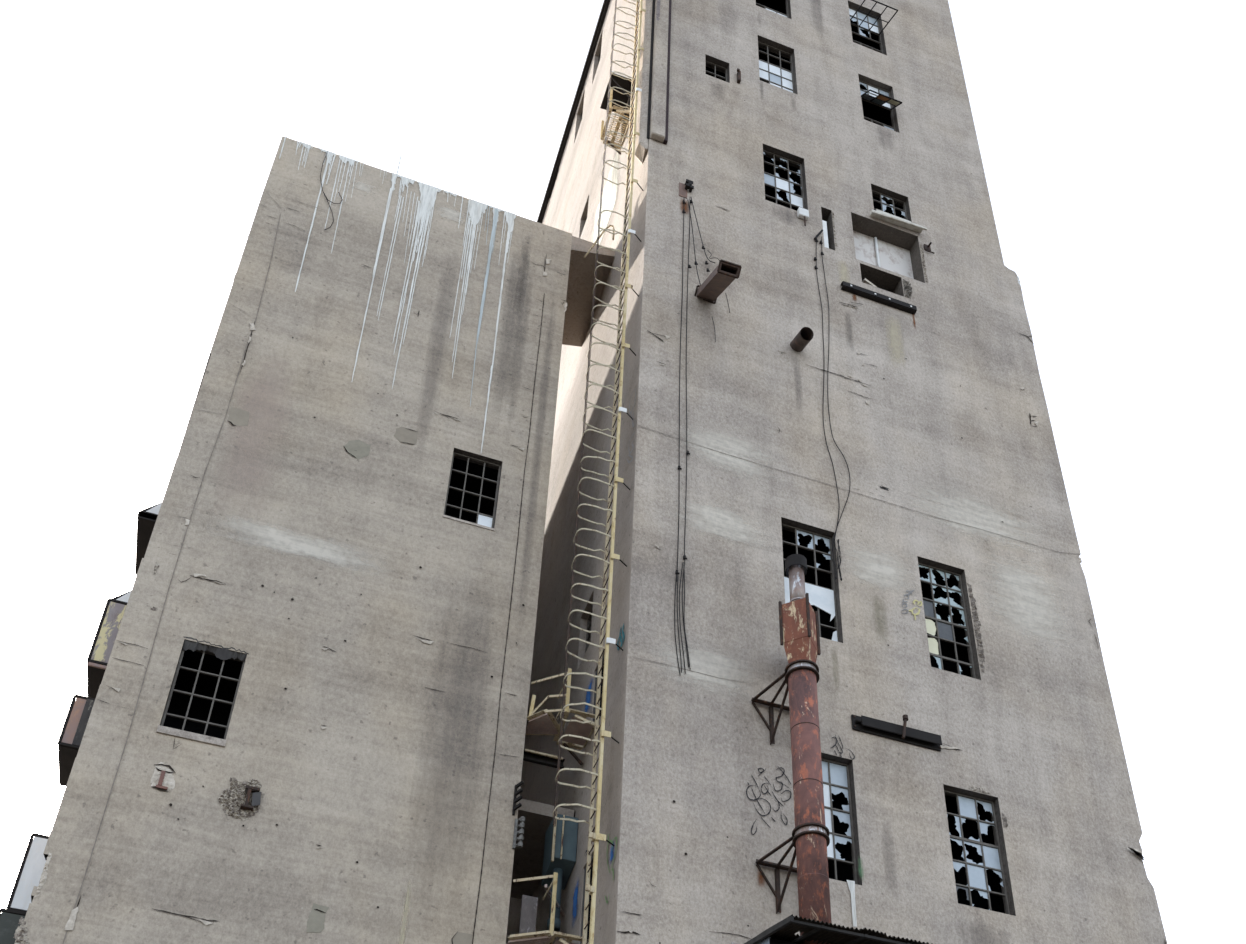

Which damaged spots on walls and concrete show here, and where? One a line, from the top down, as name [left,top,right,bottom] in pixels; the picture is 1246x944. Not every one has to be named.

water stain [279,137,516,452]
spalling [150,762,175,792]
spalling [217,777,262,821]
spalling [13,917,30,944]